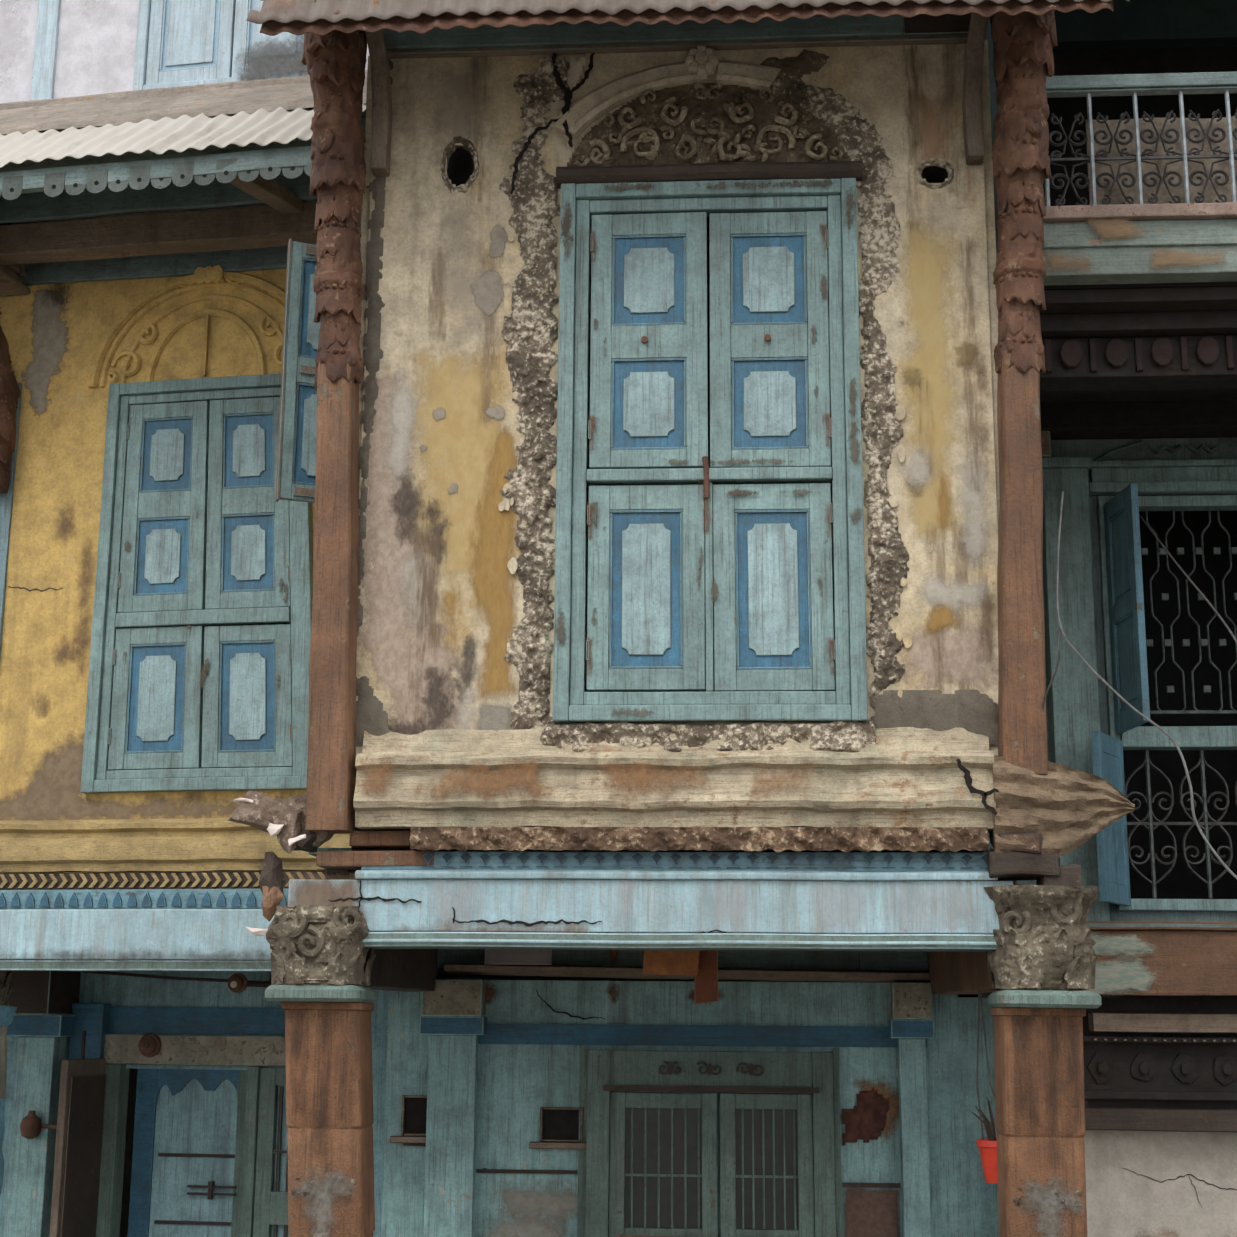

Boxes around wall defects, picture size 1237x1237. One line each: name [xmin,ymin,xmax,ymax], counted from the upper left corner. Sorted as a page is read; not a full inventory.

mould [239,34,309,81]
crack [510,53,595,194]
peeling [21,290,69,415]
spalling [471,54,590,730]
spalling [760,49,922,698]
water stain [358,317,521,735]
crack [956,759,999,815]
crack [328,880,422,908]
crack [452,907,602,927]
peeling [1078,935,1154,994]
corrosion [855,1081,900,1137]
crack [1123,1168,1237,1207]